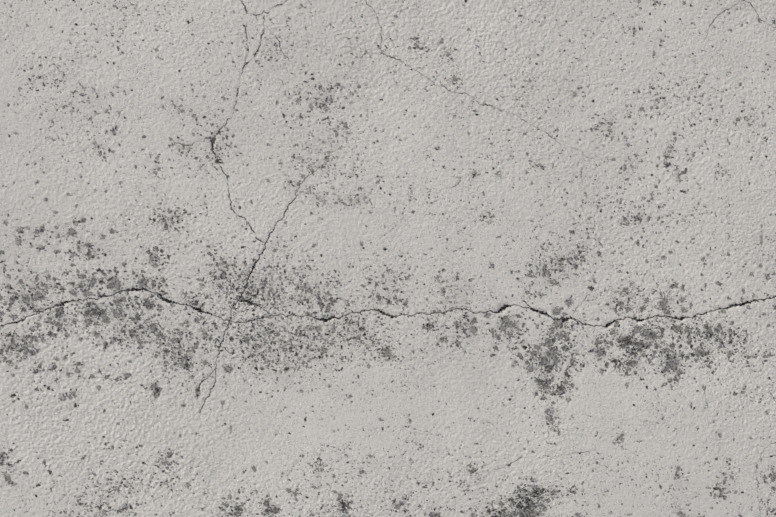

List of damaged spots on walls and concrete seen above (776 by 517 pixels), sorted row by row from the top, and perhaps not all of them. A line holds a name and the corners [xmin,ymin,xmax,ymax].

crack [0,0,776,413]